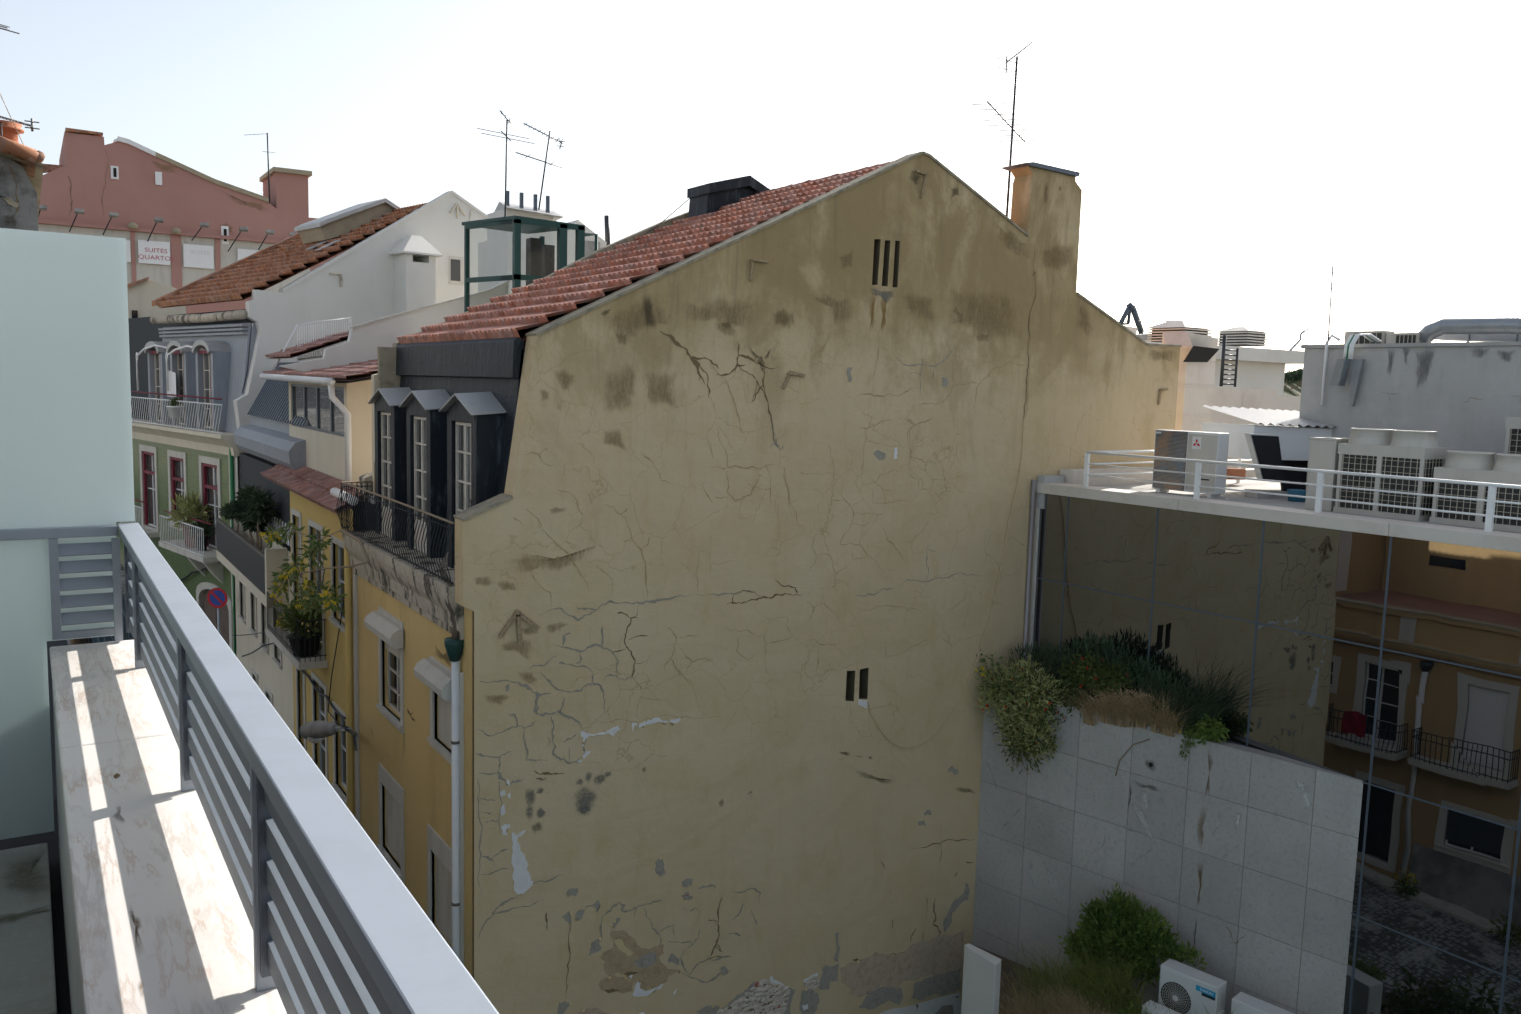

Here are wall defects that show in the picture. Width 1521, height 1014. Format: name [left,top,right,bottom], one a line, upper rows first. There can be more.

crack [476,245,1036,1000]
peeling [576,717,681,763]
peeling [500,780,533,895]
spalling [557,917,680,1014]
spalling [697,883,970,1014]